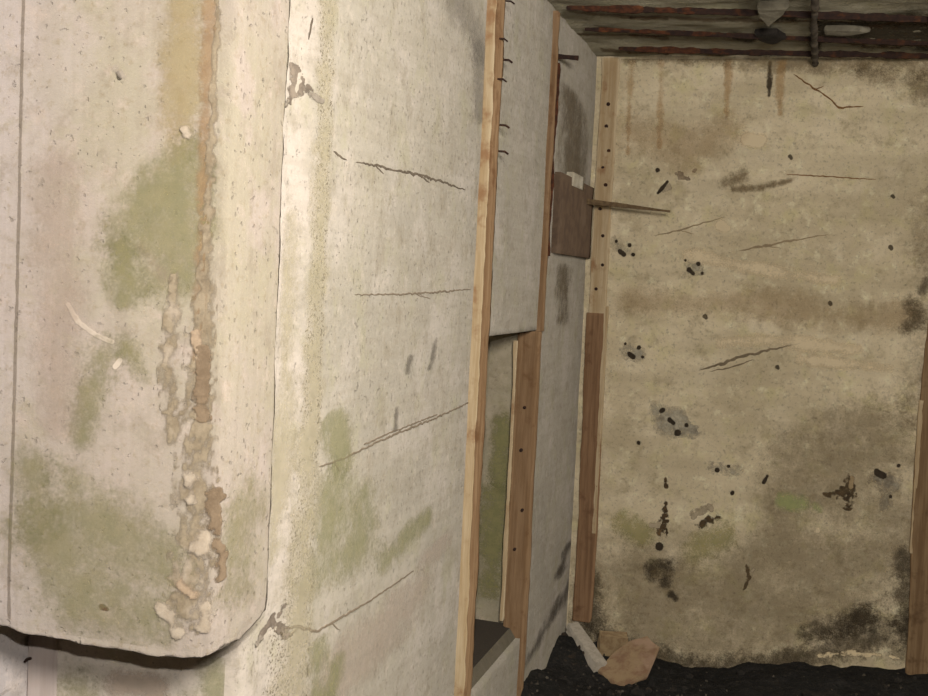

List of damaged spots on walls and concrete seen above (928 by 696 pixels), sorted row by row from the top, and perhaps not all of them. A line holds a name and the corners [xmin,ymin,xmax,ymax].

spalling [547,0,928,67]
crack [794,74,864,109]
crack [333,151,465,190]
leakage [726,173,791,191]
leakage [683,248,840,284]
spalling [154,0,229,641]
crack [700,343,800,372]
crack [320,402,469,471]
leakage [645,560,678,600]
crack [280,571,413,636]
leakage [656,550,910,668]